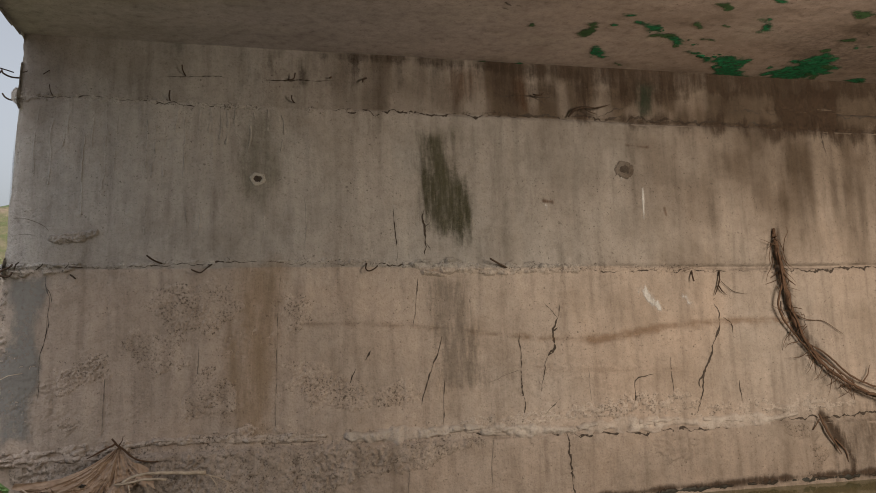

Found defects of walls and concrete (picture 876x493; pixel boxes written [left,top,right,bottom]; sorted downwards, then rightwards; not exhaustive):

crack [334,95,876,152]
damp [422,136,471,233]
crack [14,262,82,402]
spalling [0,263,112,362]
crack [103,261,306,426]
crack [376,209,431,323]
crack [422,337,445,437]
crack [489,303,561,413]
crack [554,306,733,493]
crack [580,265,876,273]
crack [780,410,876,421]